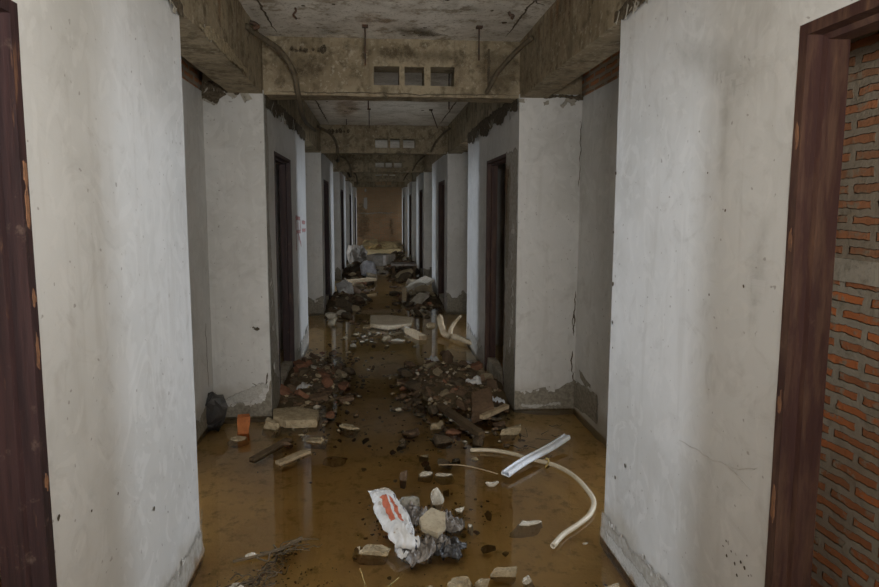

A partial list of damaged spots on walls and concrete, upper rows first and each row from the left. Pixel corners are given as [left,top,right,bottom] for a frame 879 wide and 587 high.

spalling [169,0,184,17]
crack [256,0,277,32]
crack [505,0,544,37]
spalling [614,0,648,25]
spalling [200,81,252,105]
flaking render [225,94,305,420]
flaking render [503,148,597,424]
crack [569,291,577,381]
flaking render [168,529,204,587]
flaking render [600,512,668,587]